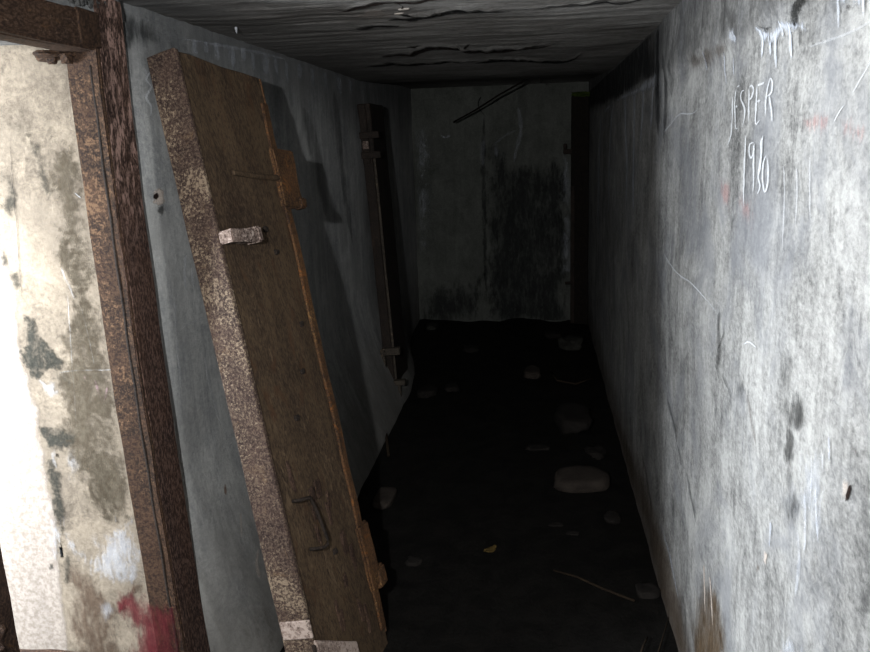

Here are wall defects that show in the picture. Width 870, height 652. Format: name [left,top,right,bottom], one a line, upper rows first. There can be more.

crack [368,42,581,67]
crack [336,0,640,30]
efflorescence [757,21,803,60]
water stain [490,160,566,320]
water stain [20,150,128,529]
corrosion [72,573,116,652]
corrosion [694,567,722,652]